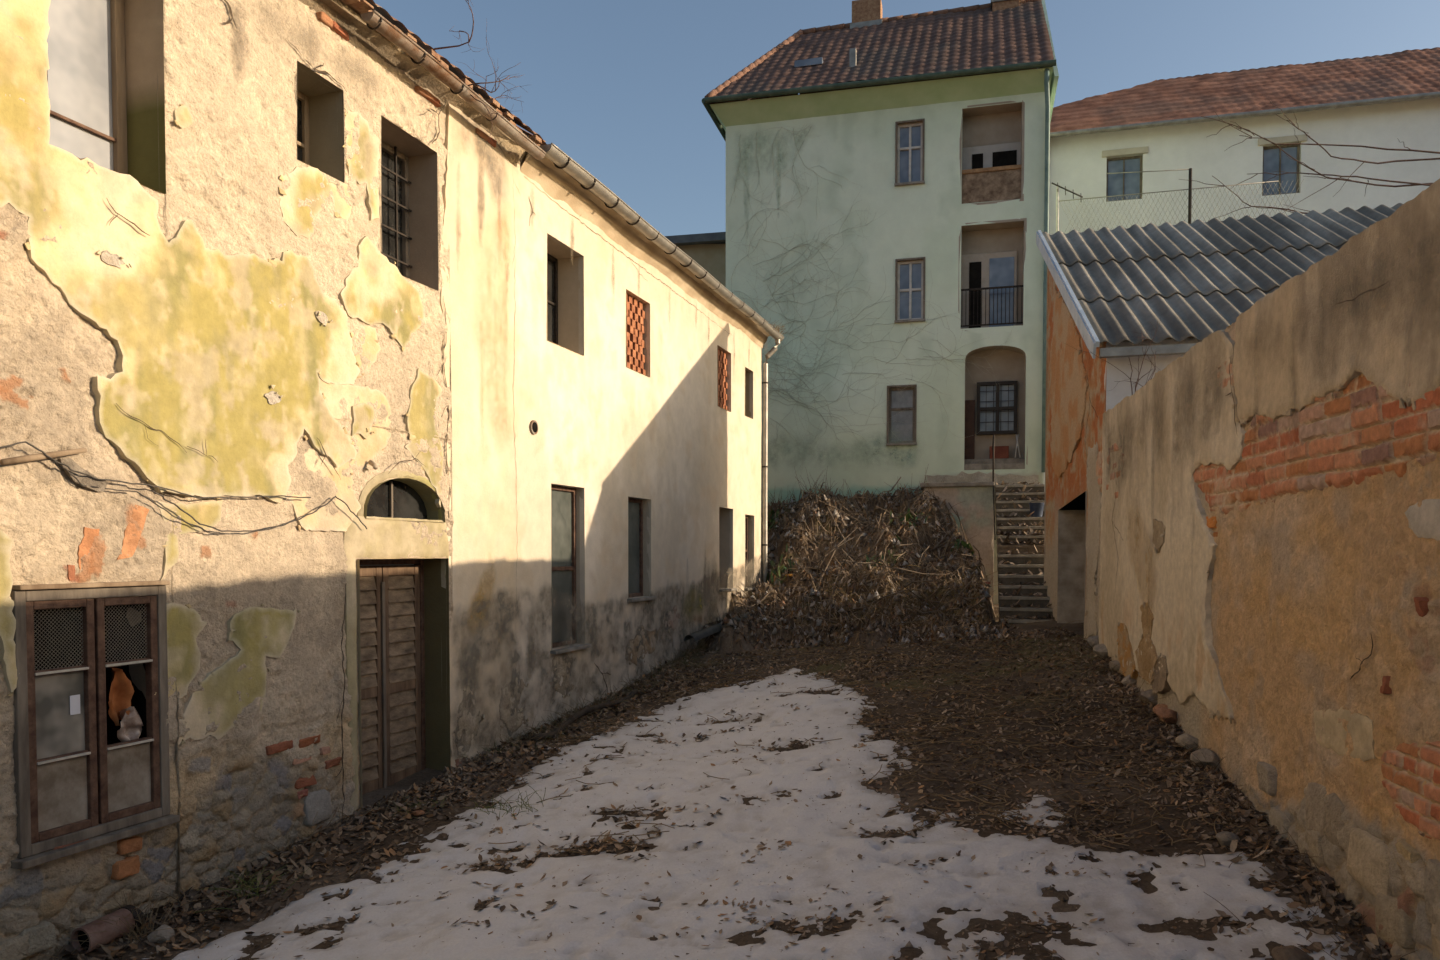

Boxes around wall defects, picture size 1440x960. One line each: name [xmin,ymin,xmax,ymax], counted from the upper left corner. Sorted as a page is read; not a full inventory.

flaking render [475,128,497,148]
flaking render [0,0,454,960]
flaking render [927,179,1440,724]
leakage [454,560,760,754]
flaking render [1381,741,1440,840]